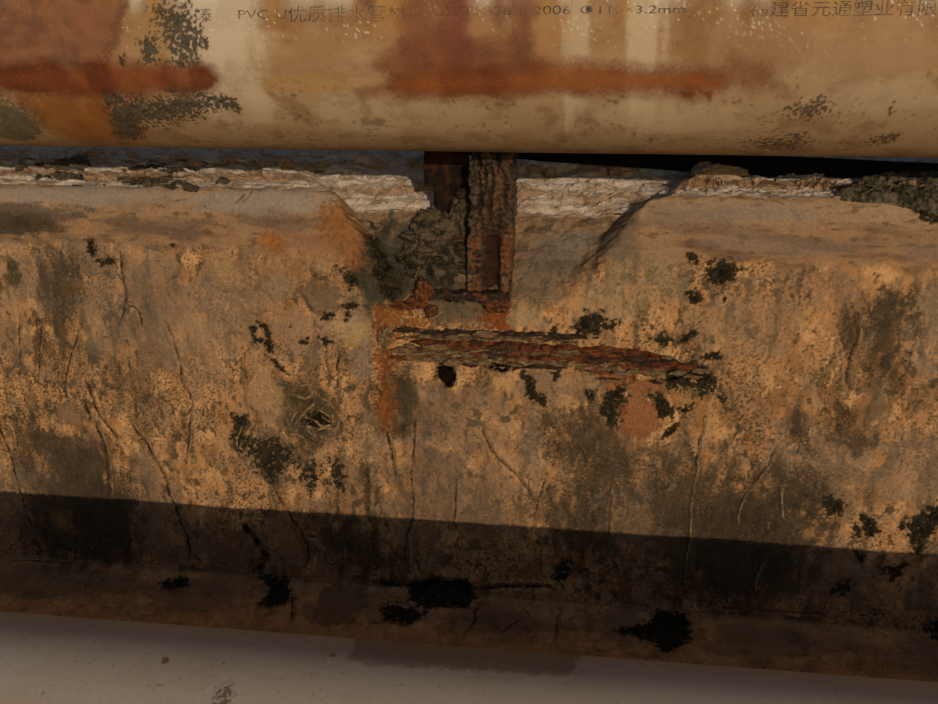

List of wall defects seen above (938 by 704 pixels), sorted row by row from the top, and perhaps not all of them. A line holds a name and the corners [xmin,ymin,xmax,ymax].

water stain [0,408,149,571]
crack [65,331,204,571]
crack [120,253,194,456]
crack [365,422,418,570]
spalling [434,366,456,389]
spalling [484,363,517,374]
crack [464,423,551,634]
corrosion [370,278,710,433]
water stain [535,401,638,579]
peeling [599,374,681,439]
water stain [646,444,842,617]
water stain [827,402,878,457]